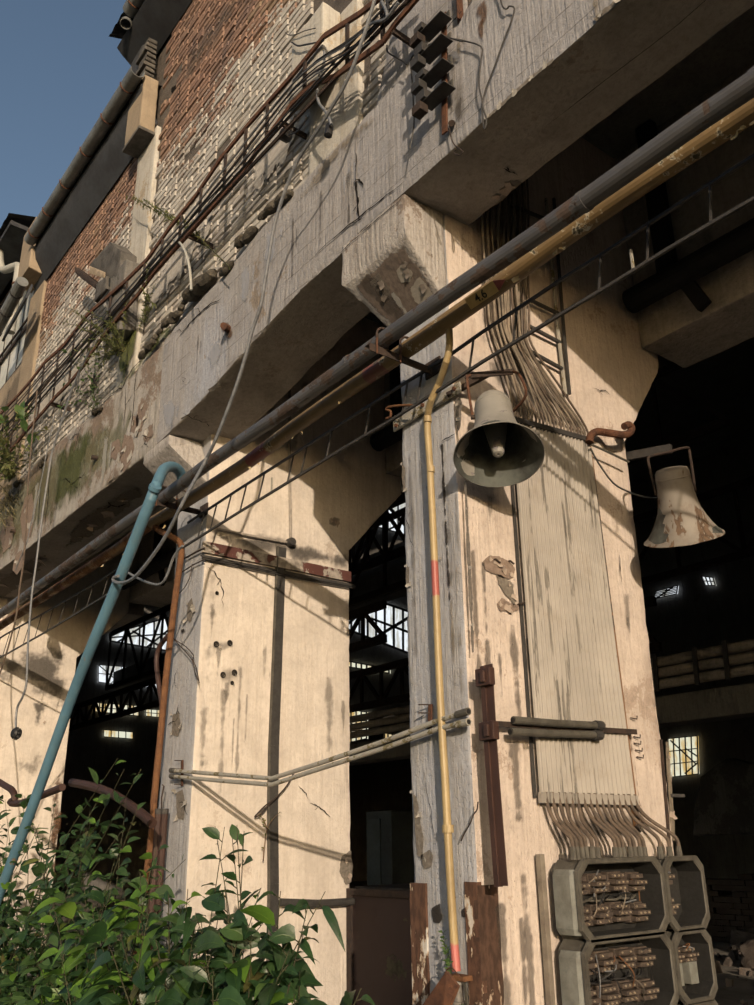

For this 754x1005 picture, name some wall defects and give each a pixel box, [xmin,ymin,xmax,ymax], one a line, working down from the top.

corrosion [477,1,486,37]
crack [315,155,402,255]
peeling [357,246,433,323]
peeling [110,399,153,472]
corrosion [182,541,356,589]
spalling [464,481,525,653]